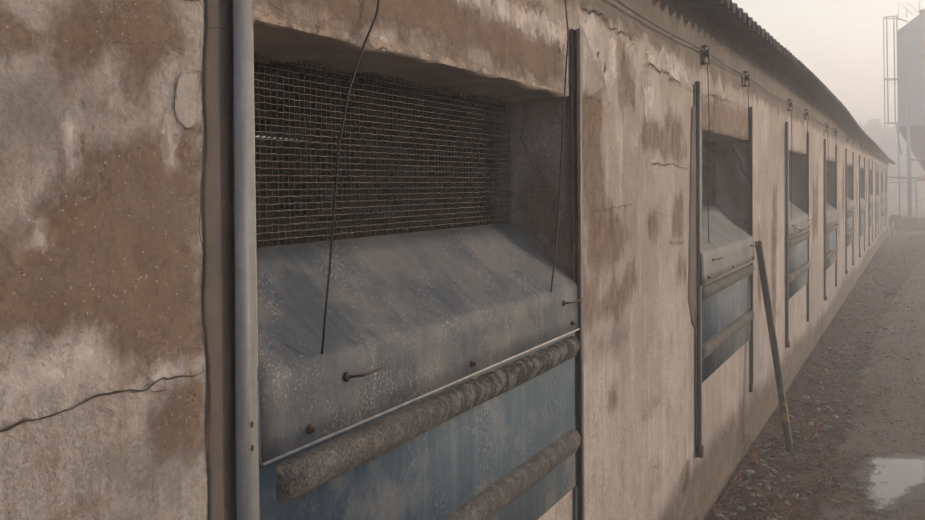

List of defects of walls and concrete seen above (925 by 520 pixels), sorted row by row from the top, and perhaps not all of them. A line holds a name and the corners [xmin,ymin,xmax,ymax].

leakage [0,12,38,52]
leakage [54,0,184,92]
leakage [253,0,565,83]
leakage [578,13,692,161]
crack [580,4,747,124]
leakage [0,110,203,386]
crack [0,109,211,433]
leakage [583,118,623,268]
leakage [673,194,683,235]
leakage [153,380,205,457]
leakage [663,229,887,520]